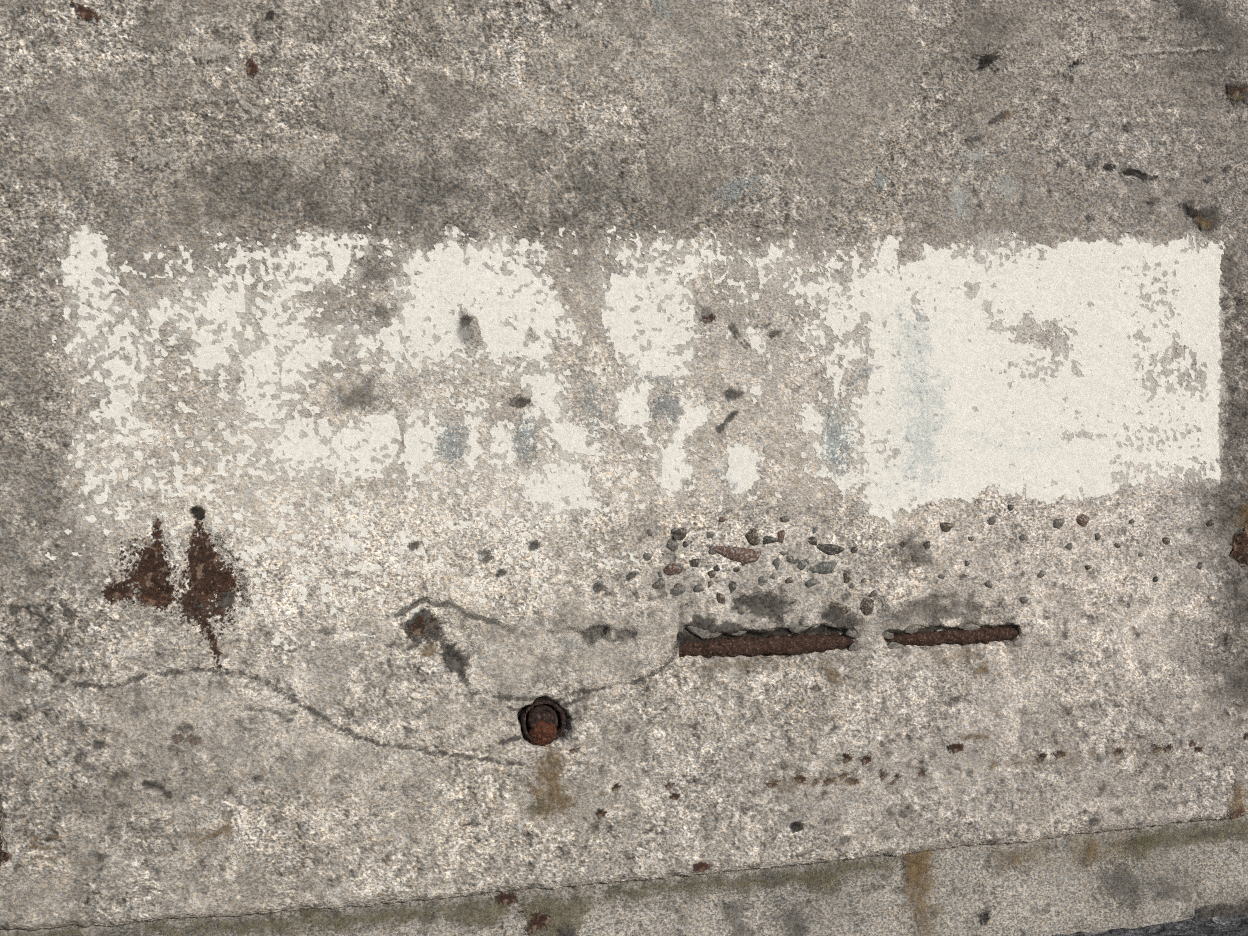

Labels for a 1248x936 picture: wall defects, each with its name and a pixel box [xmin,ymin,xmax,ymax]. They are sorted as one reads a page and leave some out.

peeling [40,224,1229,682]
corrosion [101,505,252,668]
corrosion [1230,505,1248,567]
crack [7,596,684,766]
corrosion [0,811,12,865]